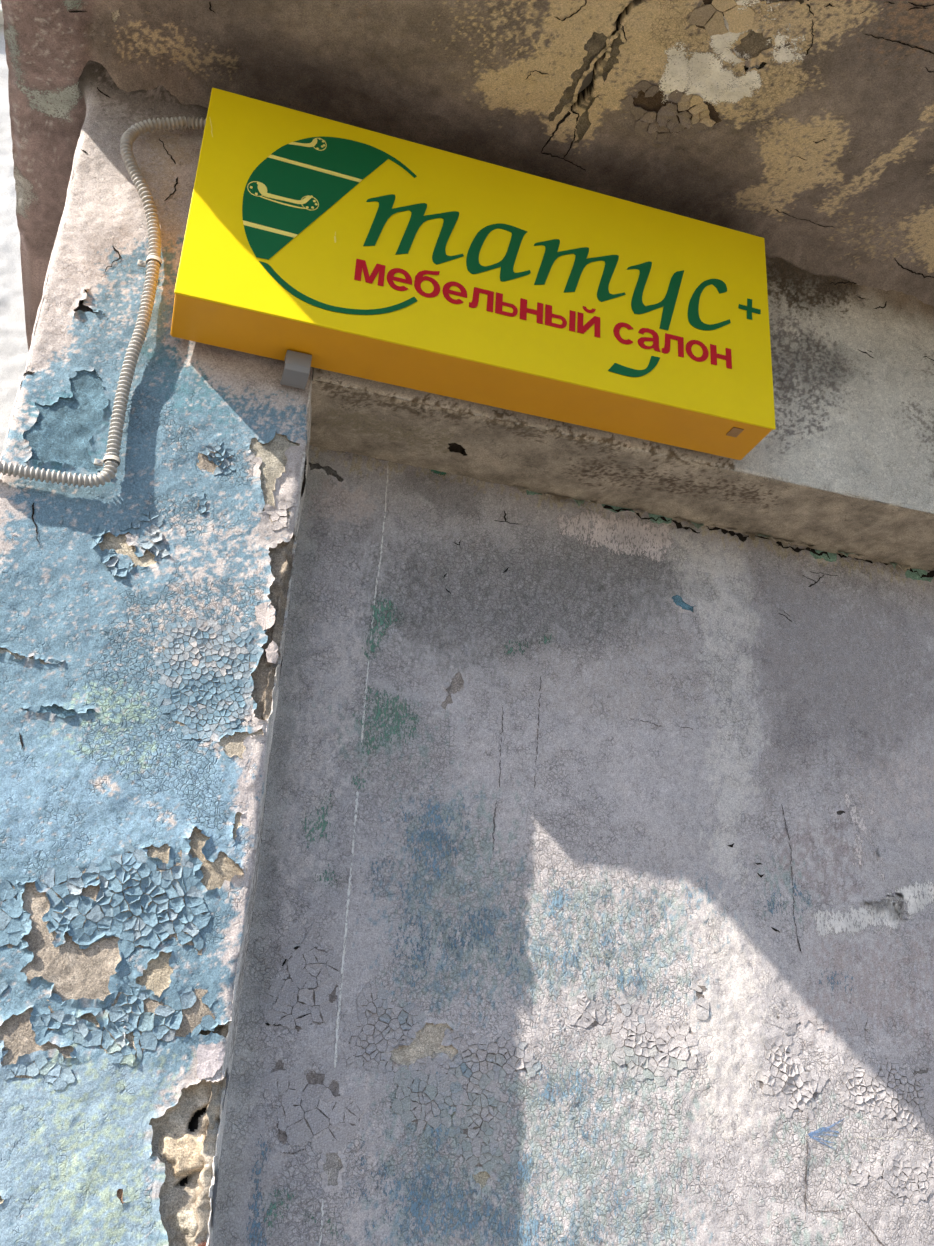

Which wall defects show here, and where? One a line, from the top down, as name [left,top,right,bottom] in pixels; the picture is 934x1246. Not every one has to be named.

leakage [658,0,806,106]
peeling [687,0,810,75]
crack [541,89,586,171]
peeling [620,80,722,142]
peeling [19,367,113,477]
peeling [90,510,170,577]
peeling [154,428,346,765]
peeling [19,700,102,723]
peeling [0,808,249,1246]
crack [246,908,541,1171]
crack [569,981,709,1086]
crack [755,1014,934,1246]